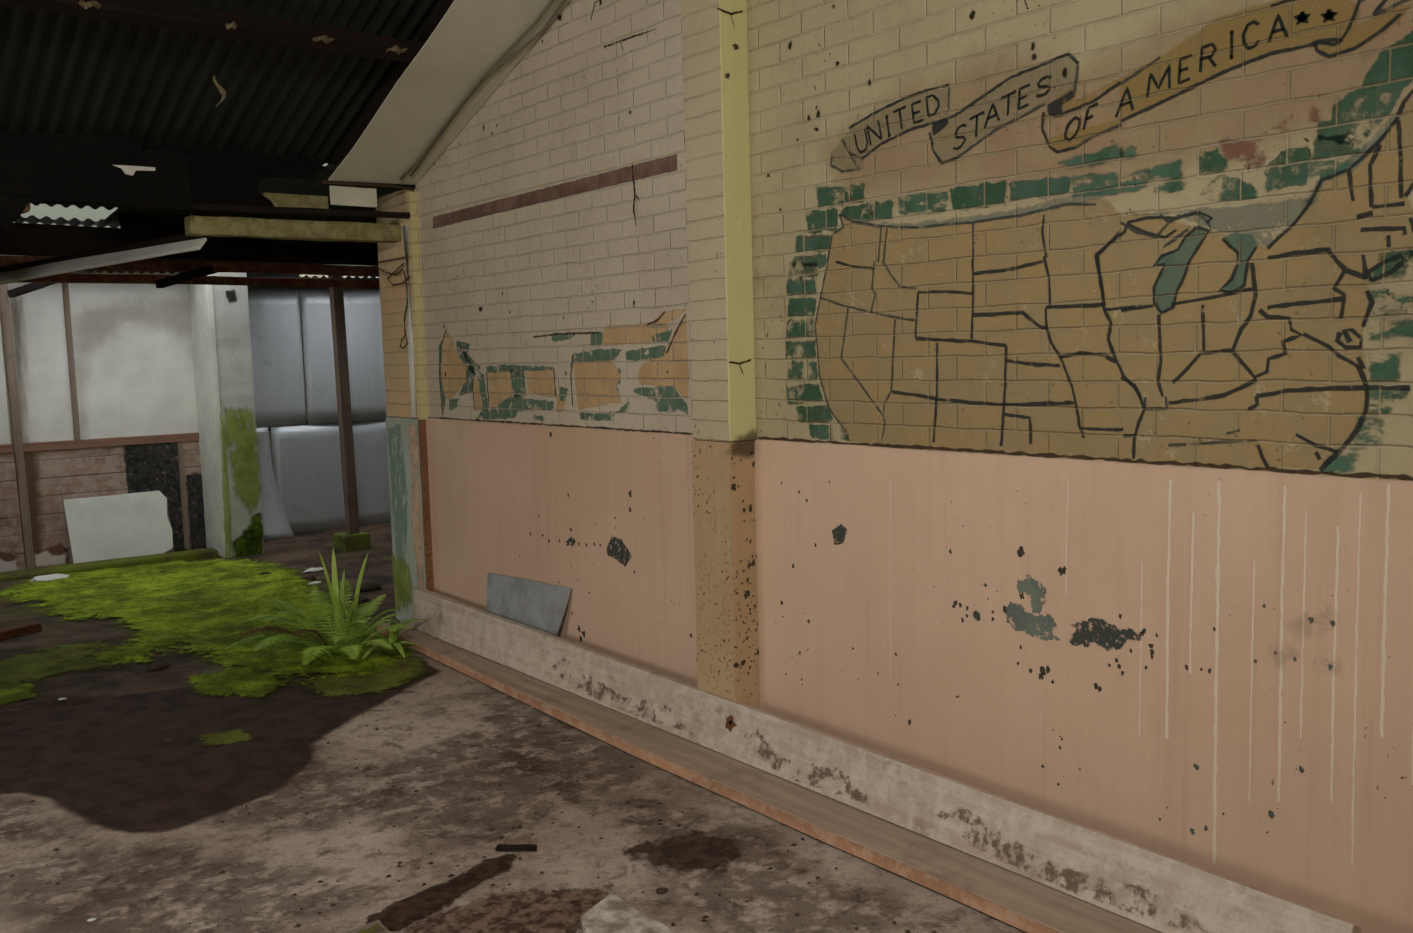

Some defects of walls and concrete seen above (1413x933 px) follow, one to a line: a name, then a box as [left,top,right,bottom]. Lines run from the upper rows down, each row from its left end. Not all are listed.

peeling [530,490,645,574]
peeling [952,574,1158,684]
damp [1190,482,1221,865]
damp [1248,486,1340,819]
damp [1351,493,1362,865]
damp [1379,485,1391,738]